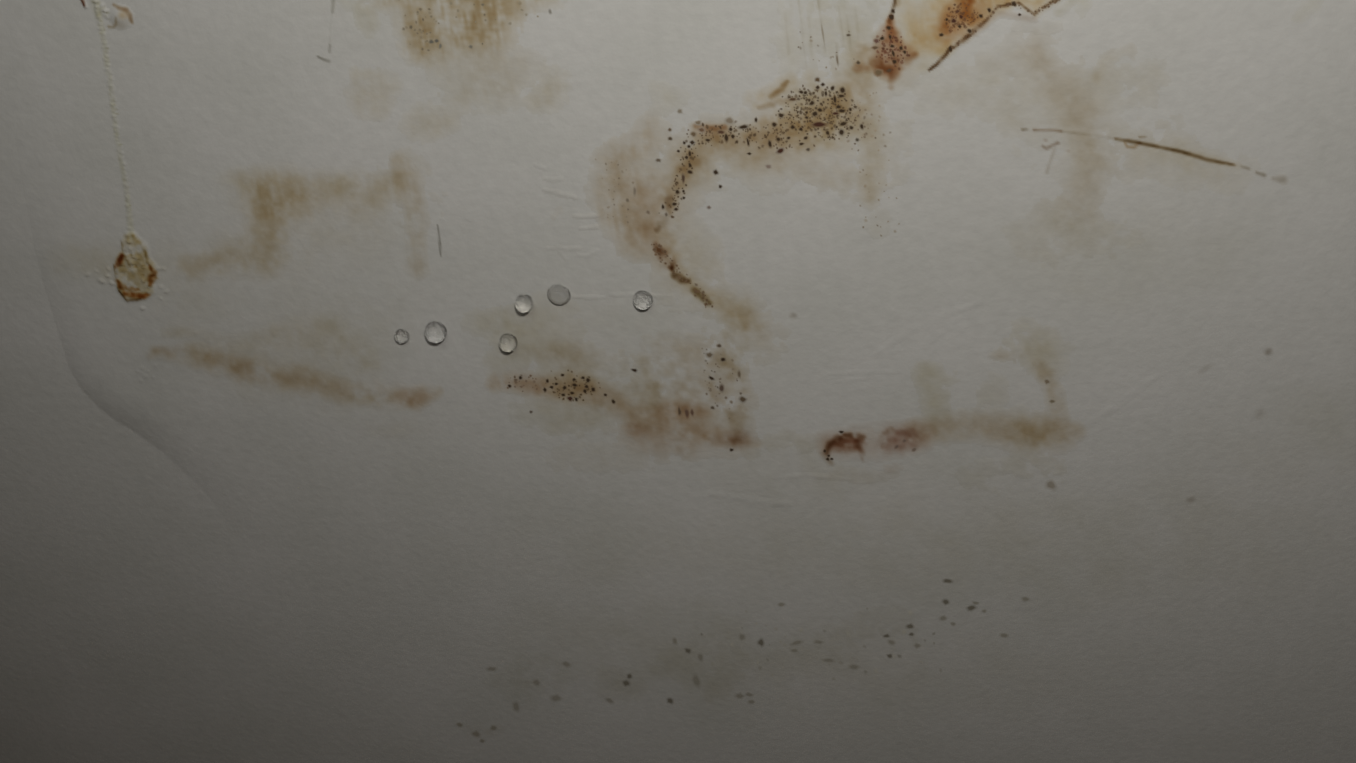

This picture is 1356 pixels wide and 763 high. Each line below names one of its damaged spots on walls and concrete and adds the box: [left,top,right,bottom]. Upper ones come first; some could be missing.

peeling [105,2,135,31]
crack [1020,127,1290,186]
flaking render [84,231,170,311]
water stain [145,0,573,438]
water stain [460,0,1261,496]